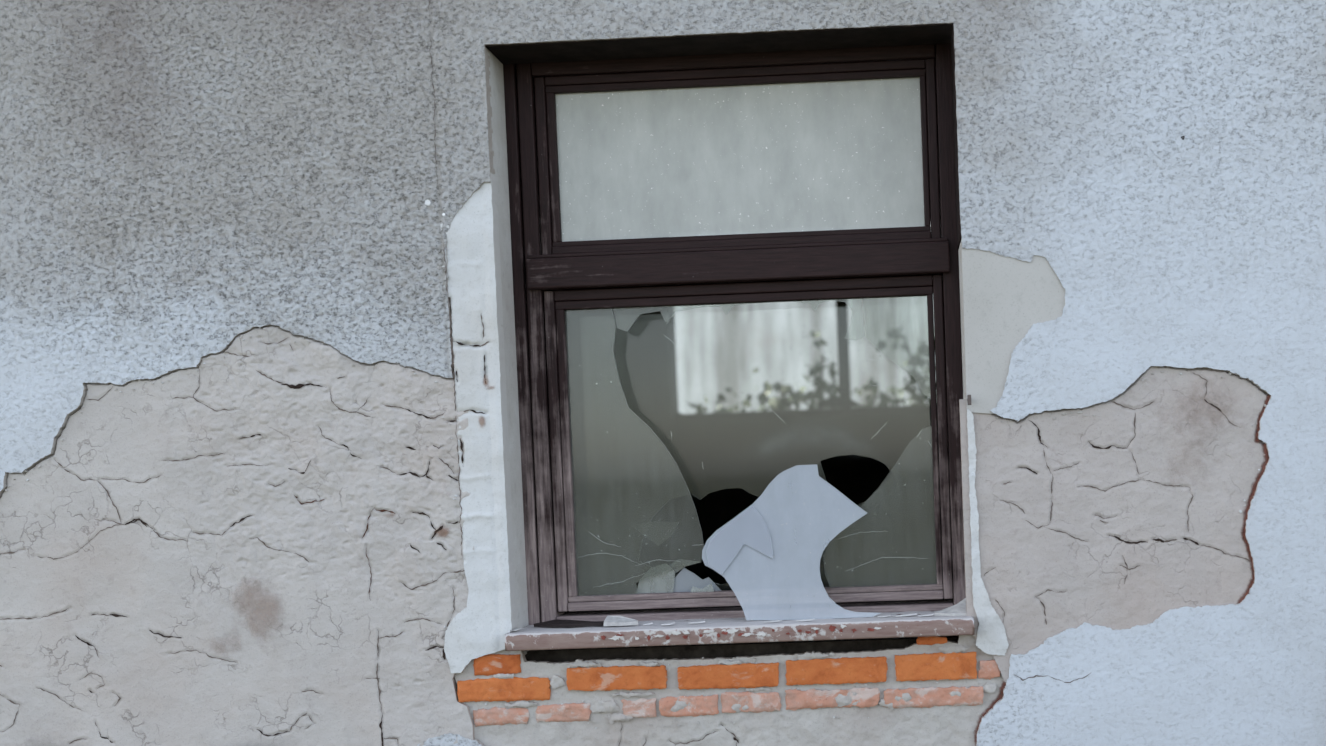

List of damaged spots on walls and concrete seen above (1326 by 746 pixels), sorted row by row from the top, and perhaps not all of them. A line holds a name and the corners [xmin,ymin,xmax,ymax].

crack [0,242,488,746]
flaking render [0,173,1268,746]
crack [1004,401,1251,584]
crack [1195,374,1242,428]